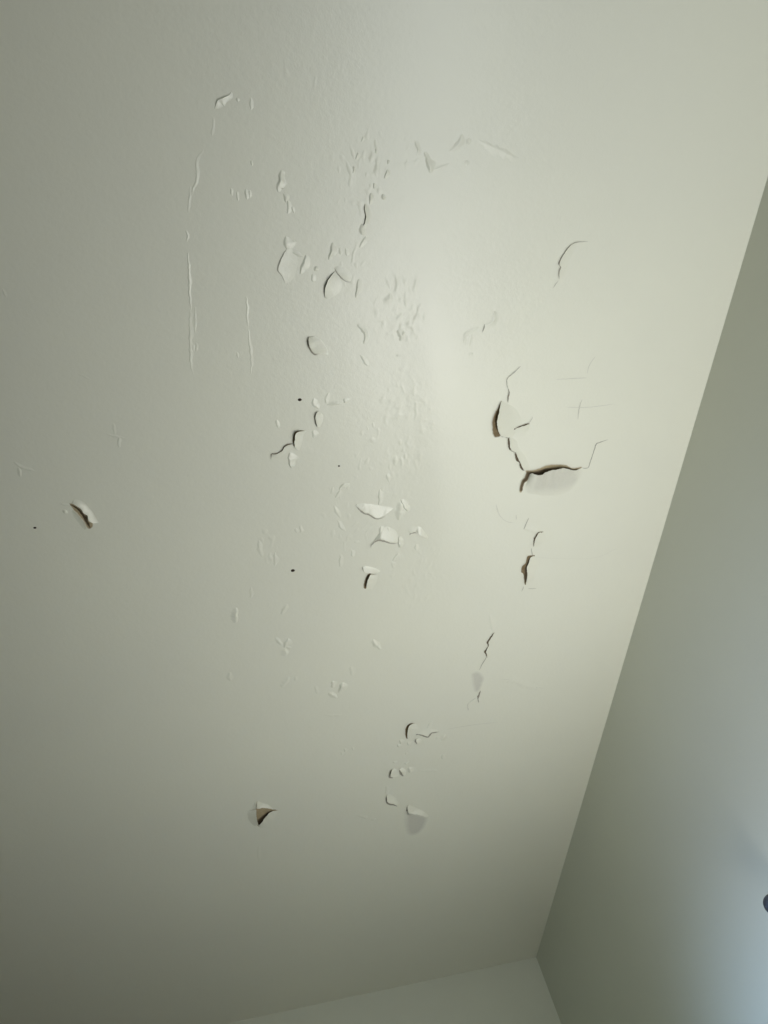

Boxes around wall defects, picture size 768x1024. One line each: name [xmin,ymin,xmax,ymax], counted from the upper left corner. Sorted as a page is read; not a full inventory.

peeling [277,193,386,299]
crack [553,241,588,288]
peeling [270,392,350,468]
peeling [61,499,99,530]
peeling [356,473,411,548]
crack [491,357,624,592]
peeling [363,566,380,589]
crack [467,615,498,711]
peeling [405,721,447,741]
peeling [247,801,279,828]
peeling [385,760,438,836]